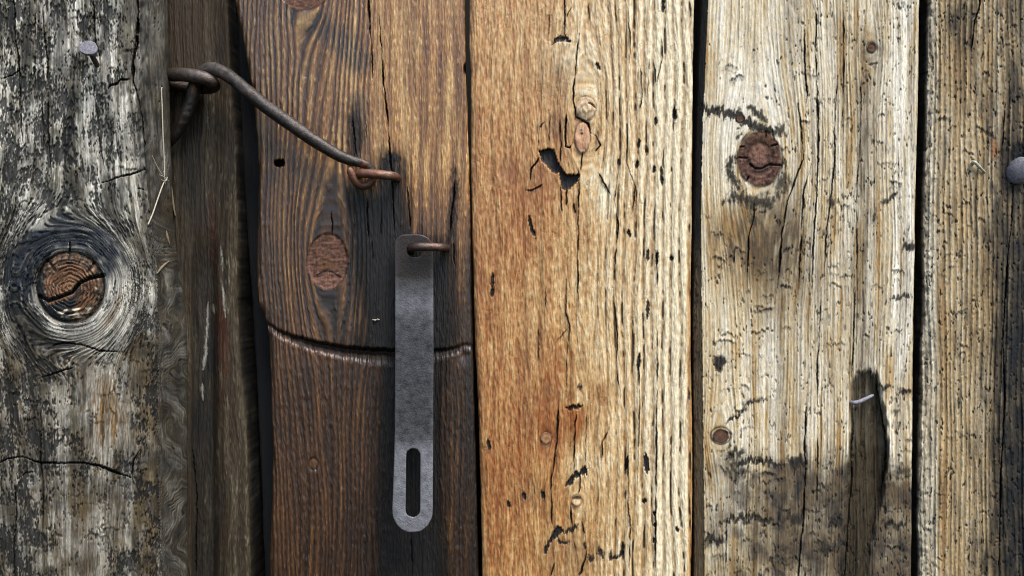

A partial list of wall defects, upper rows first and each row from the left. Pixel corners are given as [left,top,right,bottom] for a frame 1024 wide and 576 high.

crack [93,0,146,190]
crack [528,0,636,369]
crack [640,46,663,107]
crack [779,15,862,276]
crack [614,304,659,384]
crack [1,409,138,576]